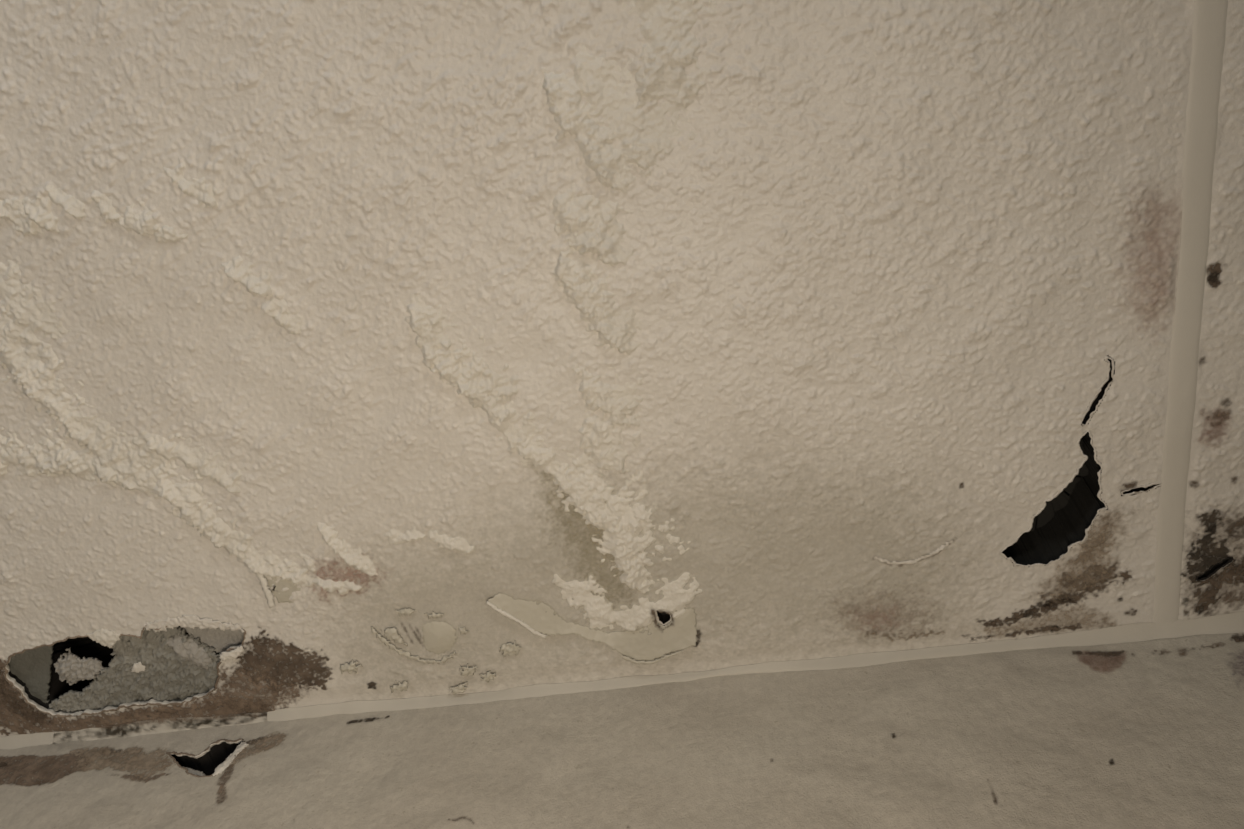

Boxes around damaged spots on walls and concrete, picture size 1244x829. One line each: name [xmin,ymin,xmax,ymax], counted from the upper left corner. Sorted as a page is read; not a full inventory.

crack [1081,355,1115,426]
crack [1121,482,1163,496]
damp [977,513,1137,639]
damp [1181,510,1244,614]
peeling [486,592,701,665]
spalling [4,615,246,718]
spalling [166,739,249,778]